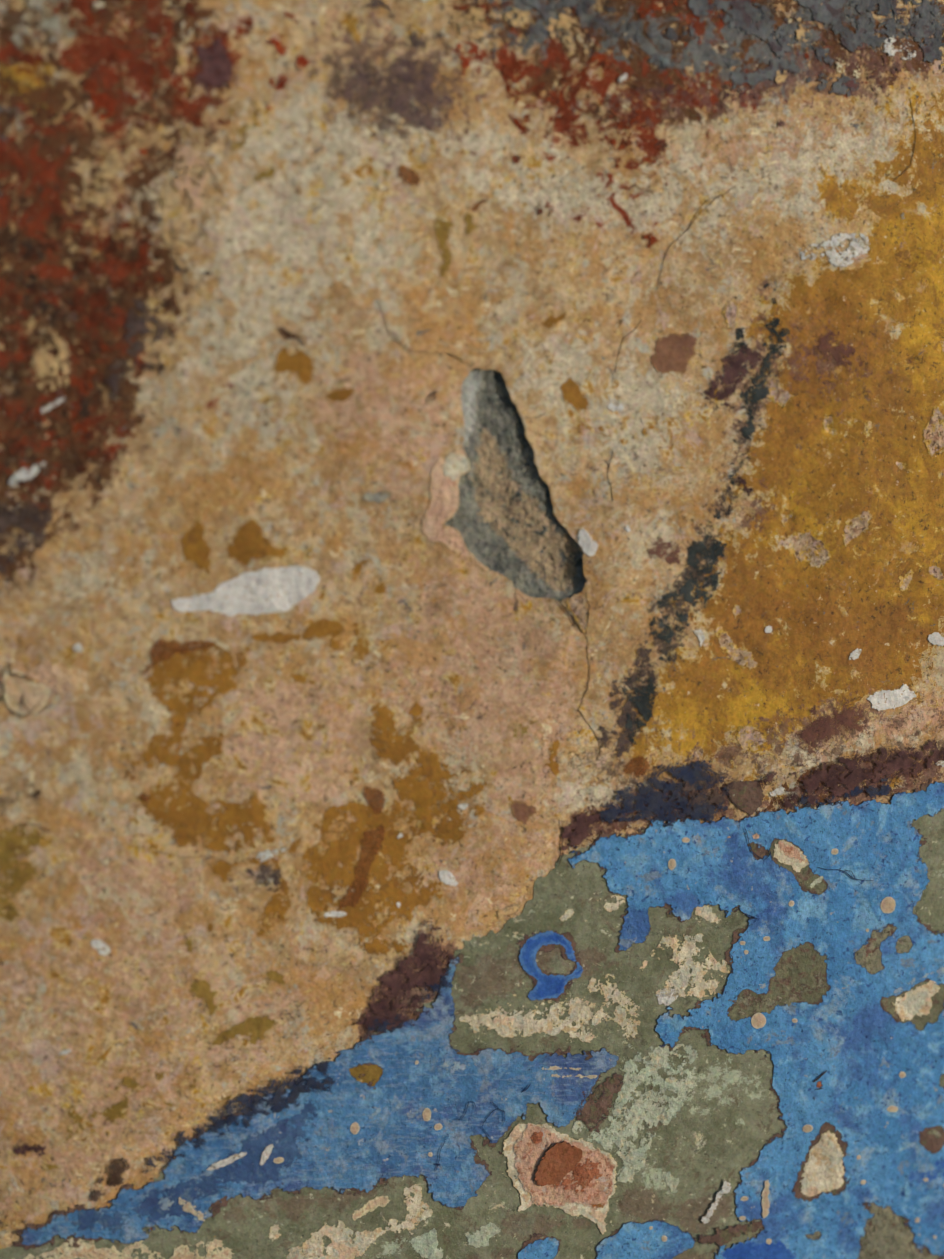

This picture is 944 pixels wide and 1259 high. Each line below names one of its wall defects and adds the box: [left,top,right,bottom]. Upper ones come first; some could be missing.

peeling [7,0,230,143]
peeling [449,0,944,191]
peeling [0,106,230,496]
peeling [641,230,660,248]
spalling [422,368,589,632]
peeling [12,777,944,1259]